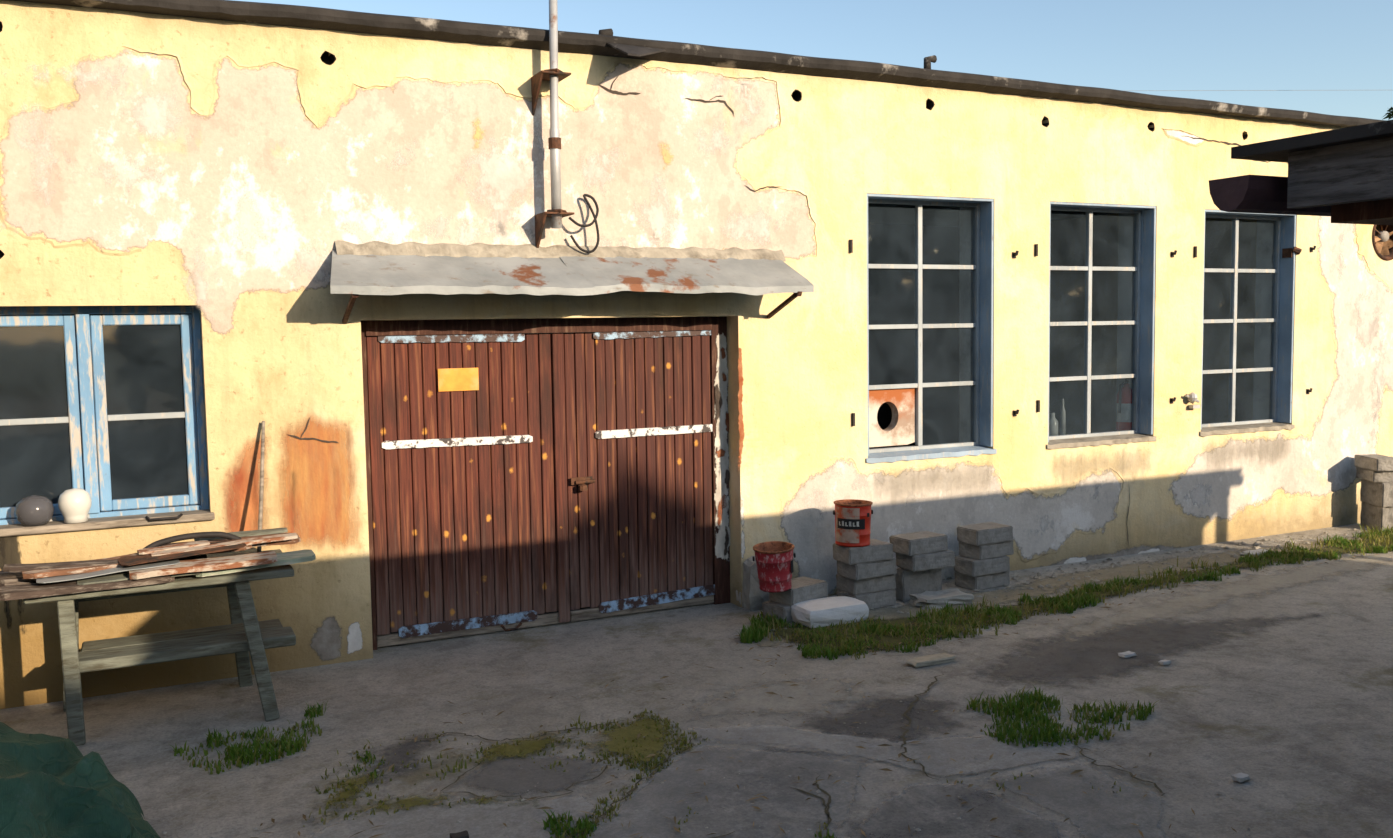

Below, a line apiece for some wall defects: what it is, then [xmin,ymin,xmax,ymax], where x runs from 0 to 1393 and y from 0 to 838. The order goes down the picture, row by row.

flaking render [0,44,818,334]
crack [1185,136,1271,163]
flaking render [1167,216,1393,524]
rust [227,439,265,532]
crack [287,418,338,443]
rust [282,419,353,545]
flaking render [777,456,1181,596]
crack [398,719,698,838]
crack [791,772,835,838]
crack [900,673,944,779]
crack [1077,746,1165,797]